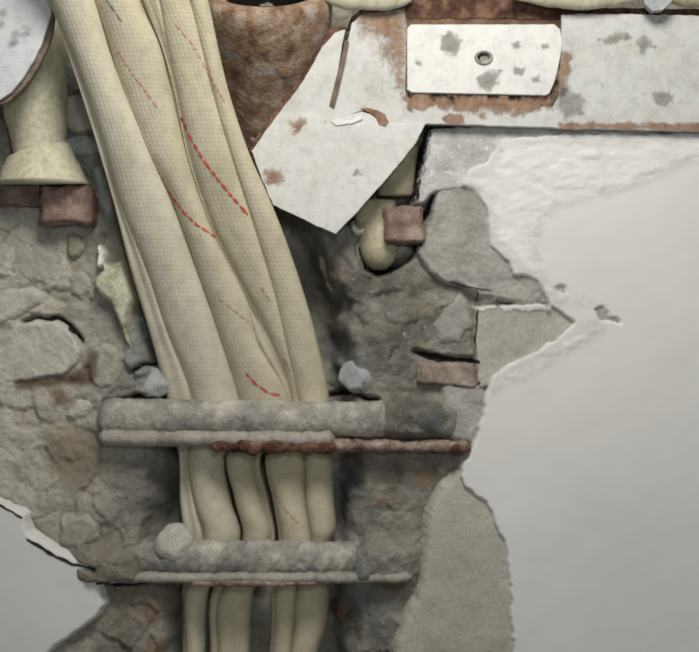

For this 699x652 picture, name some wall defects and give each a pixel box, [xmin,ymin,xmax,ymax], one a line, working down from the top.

corrosion [249,26,346,157]
corrosion [403,52,572,125]
corrosion [559,122,699,131]
corrosion [264,170,282,184]
crack [25,316,84,341]
spalling [0,50,194,652]
crack [415,282,490,364]
spalling [271,125,699,444]
spalling [224,454,243,541]
spalling [260,453,279,541]
spalling [318,451,513,652]
spalling [250,586,273,652]